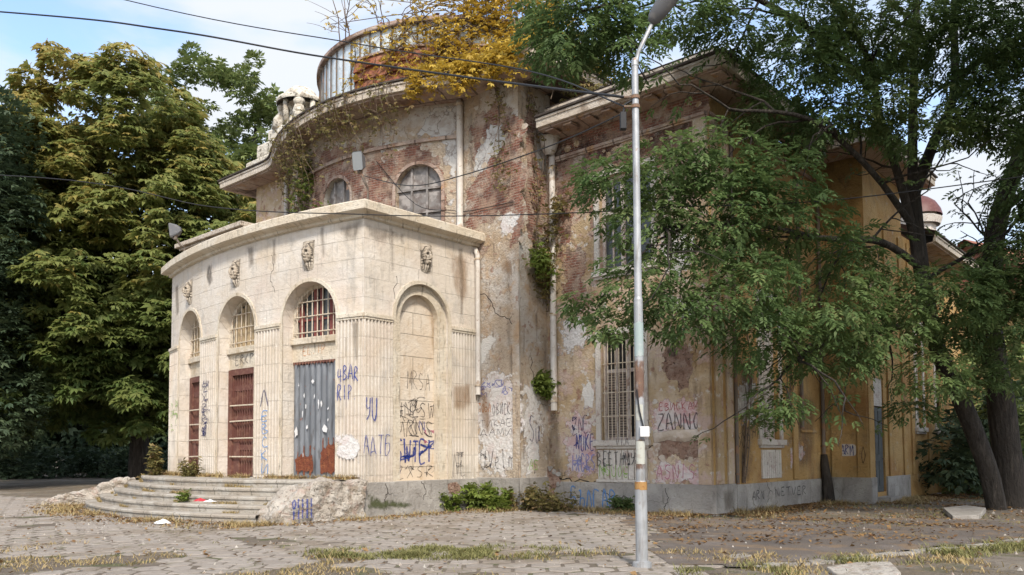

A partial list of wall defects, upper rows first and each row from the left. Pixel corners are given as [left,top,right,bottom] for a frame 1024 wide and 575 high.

spalling [297,90,711,359]
rust [295,437,335,476]
peeling [478,334,598,495]
spalling [650,341,699,485]